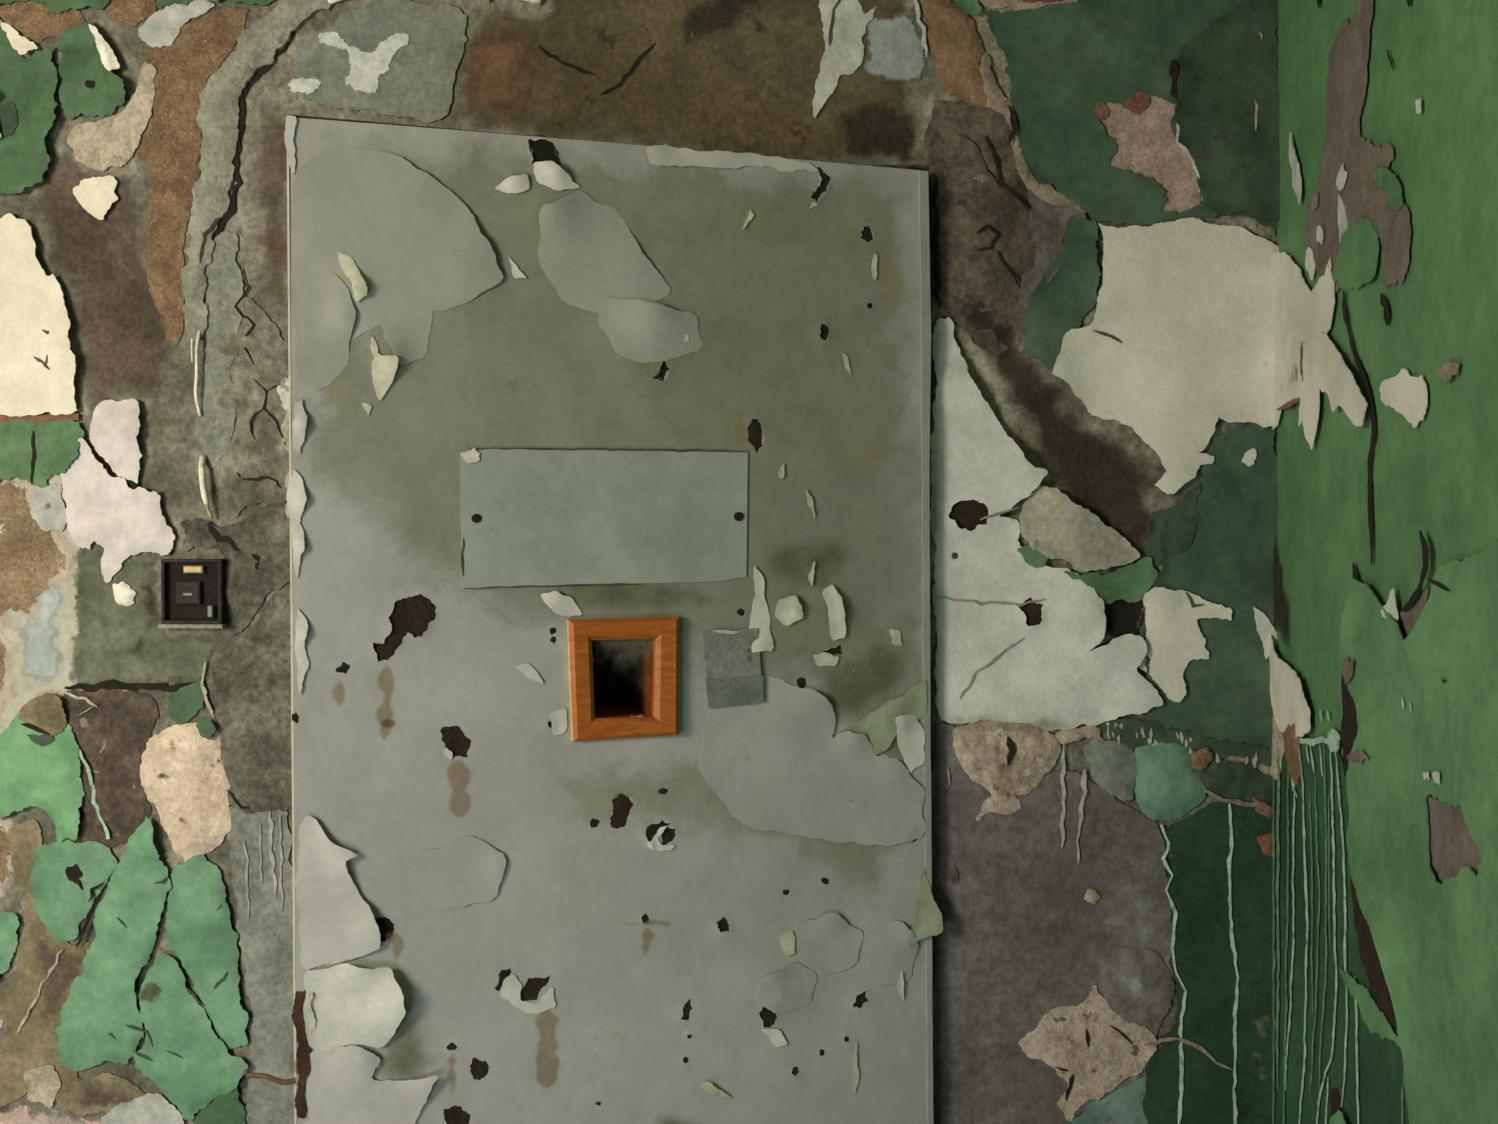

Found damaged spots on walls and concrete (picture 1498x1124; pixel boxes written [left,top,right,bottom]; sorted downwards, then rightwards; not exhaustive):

spalling [0,0,274,345]
peeling [0,213,290,636]
peeling [0,678,294,1124]
crack [195,31,295,488]
corrosion [373,594,436,662]
leakage [464,0,928,159]
leakage [967,300,1151,570]
peeling [924,0,1498,1124]
crack [1341,674,1358,828]
crack [1350,877,1397,1030]
crack [1343,291,1450,636]